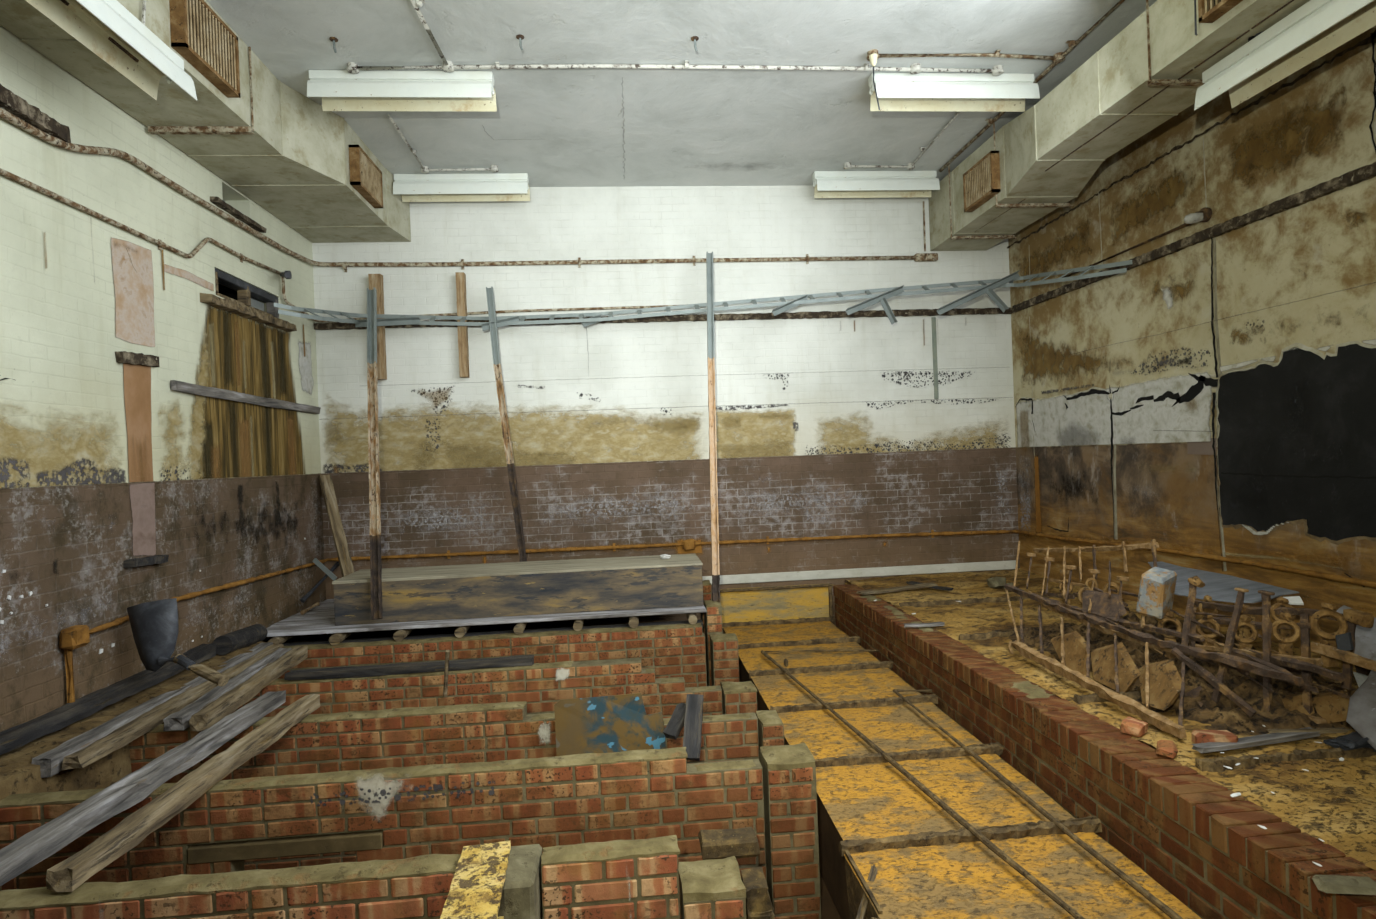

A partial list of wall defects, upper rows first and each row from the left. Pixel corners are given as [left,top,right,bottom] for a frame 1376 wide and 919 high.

corrosion [1229,86,1346,188]
corrosion [1018,220,1091,282]
corrosion [1111,170,1192,245]
corrosion [1153,280,1192,308]
damp [0,417,126,488]
damp [324,386,699,473]
damp [716,371,1010,458]
crack [1015,237,1227,571]
mould [1133,348,1210,375]
flaking render [1017,339,1376,545]